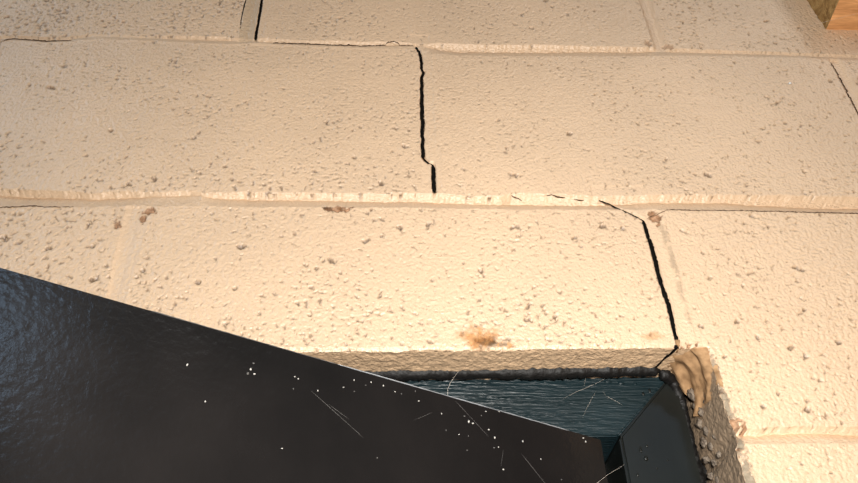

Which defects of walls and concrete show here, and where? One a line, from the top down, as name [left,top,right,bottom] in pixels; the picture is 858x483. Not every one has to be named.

crack [4,36,71,44]
crack [240,0,436,193]
crack [831,63,858,114]
crack [547,194,858,368]